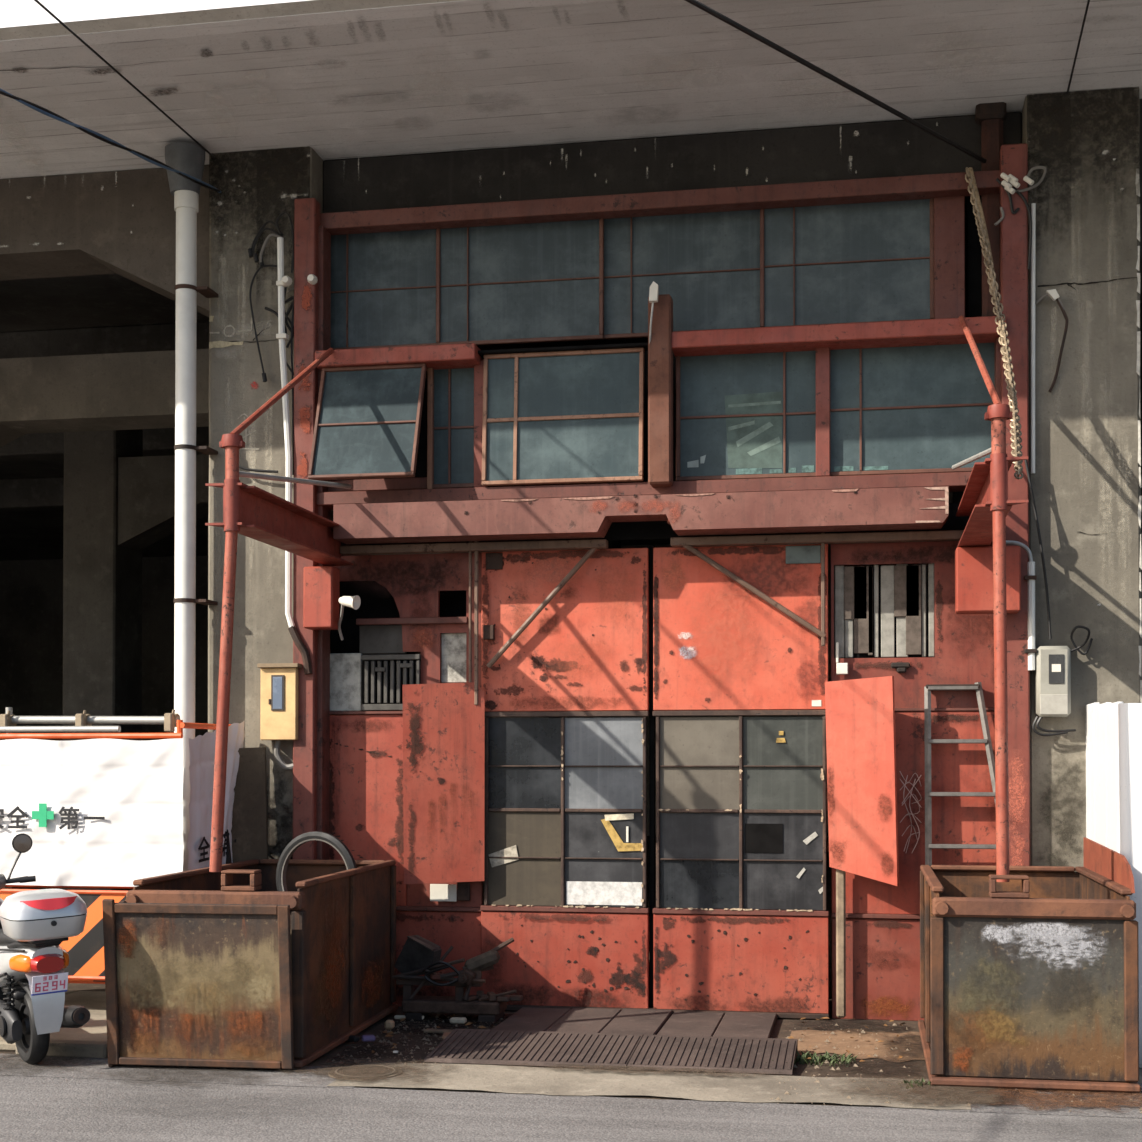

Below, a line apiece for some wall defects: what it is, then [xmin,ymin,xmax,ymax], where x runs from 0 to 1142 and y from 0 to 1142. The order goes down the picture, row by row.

corrosion [520,550,629,559]
corrosion [671,546,786,556]
corrosion [642,563,659,699]
corrosion [818,574,827,695]
corrosion [395,745,404,864]
corrosion [576,970,593,983]
corrosion [609,916,790,999]